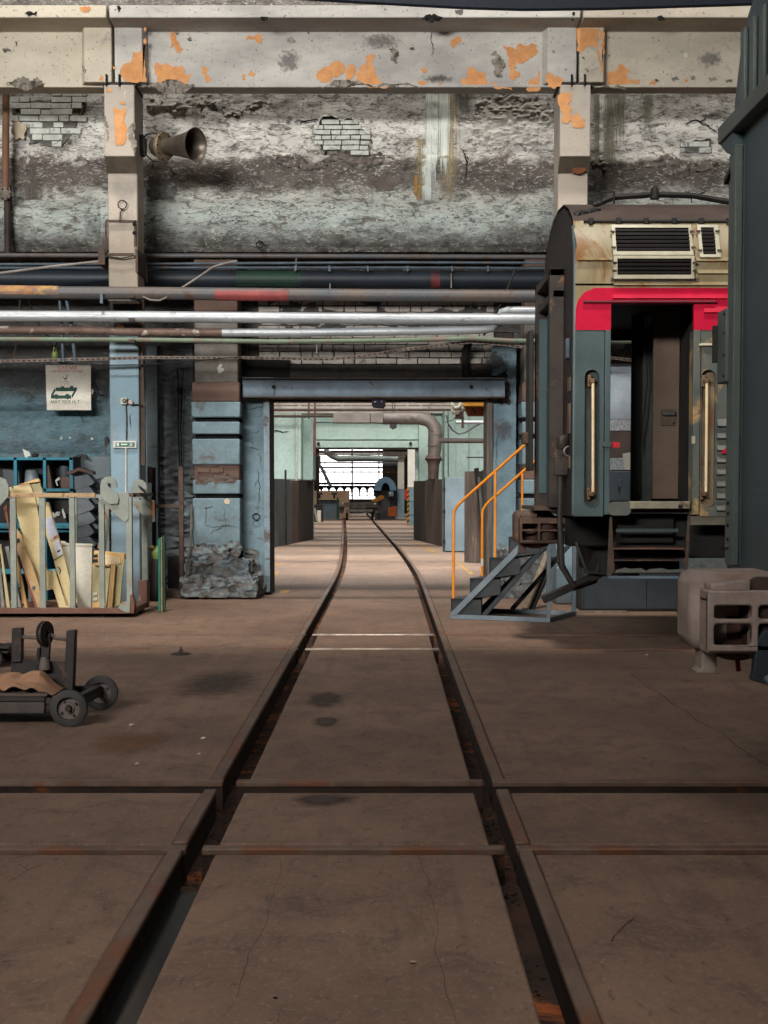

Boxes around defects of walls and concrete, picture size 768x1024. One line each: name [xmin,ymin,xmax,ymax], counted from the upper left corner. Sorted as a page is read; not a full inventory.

flaking render [6,76,105,168]
peeling [99,74,137,153]
flaking render [113,27,275,115]
flaking render [259,114,421,191]
peeling [316,54,442,89]
damp [418,94,470,200]
flaking render [461,43,585,153]
peeling [571,12,732,90]
flaking render [157,344,260,589]